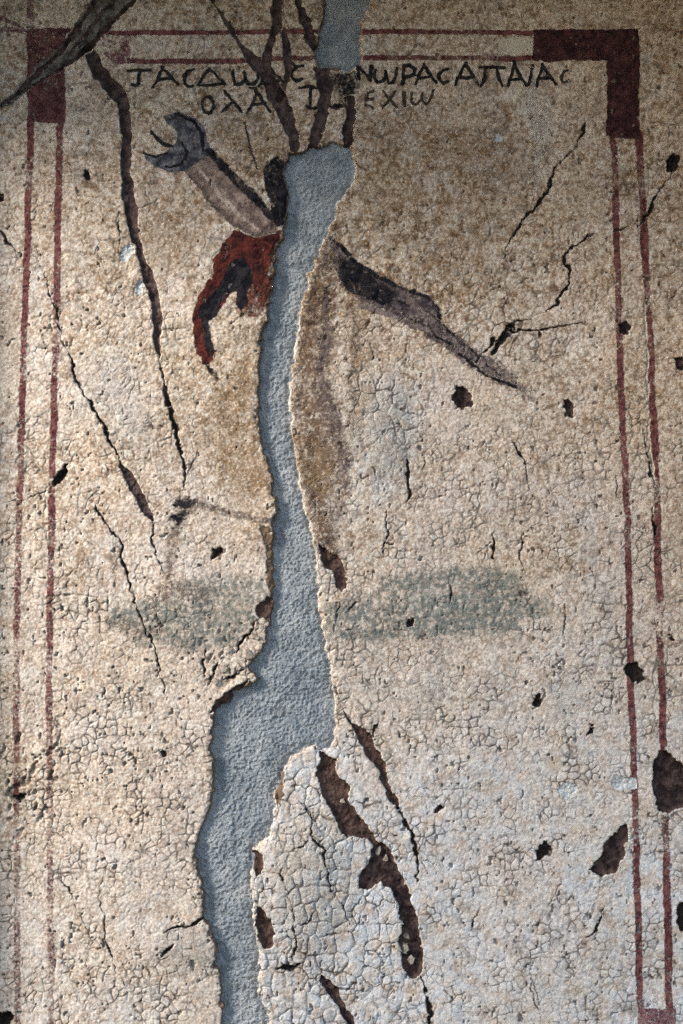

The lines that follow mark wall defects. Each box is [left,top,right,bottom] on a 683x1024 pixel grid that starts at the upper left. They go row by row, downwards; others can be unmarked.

crack [0,0,194,486]
crack [504,123,586,258]
crack [475,153,680,364]
crack [44,276,163,571]
crack [95,506,165,691]
spalling [201,525,275,715]
crack [161,0,419,1024]
spalling [319,544,348,594]
spalling [253,904,276,949]
spalling [316,751,434,1024]
spalling [589,822,628,880]
spalling [651,746,683,815]